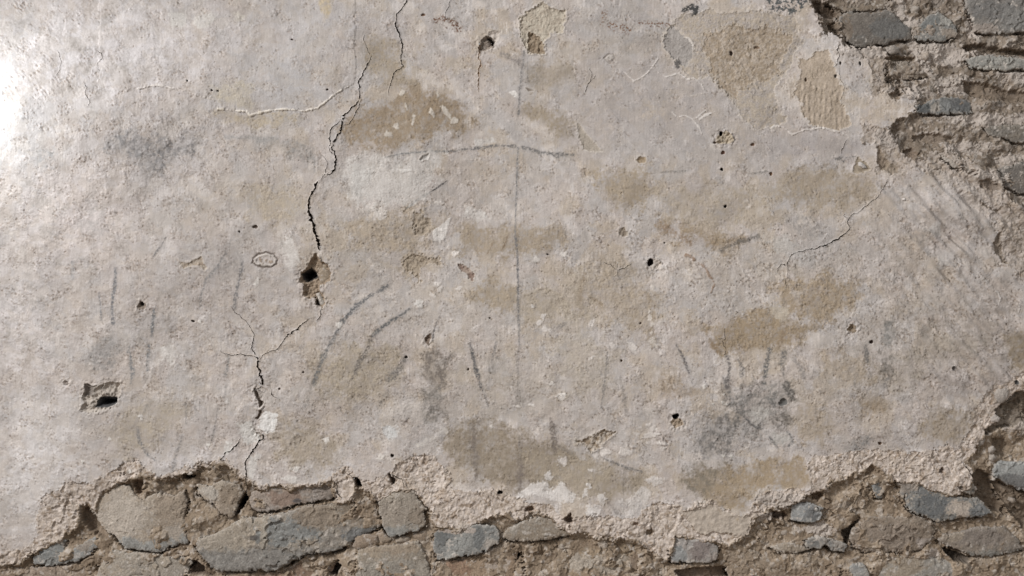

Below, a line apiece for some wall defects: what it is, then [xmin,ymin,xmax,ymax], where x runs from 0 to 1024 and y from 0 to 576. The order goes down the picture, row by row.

flaking render [518,2,566,54]
crack [306,0,409,251]
spalling [662,0,1024,278]
spalling [299,253,331,308]
crack [776,178,888,288]
crack [220,306,323,399]
crack [218,434,265,492]
spalling [0,371,1024,576]